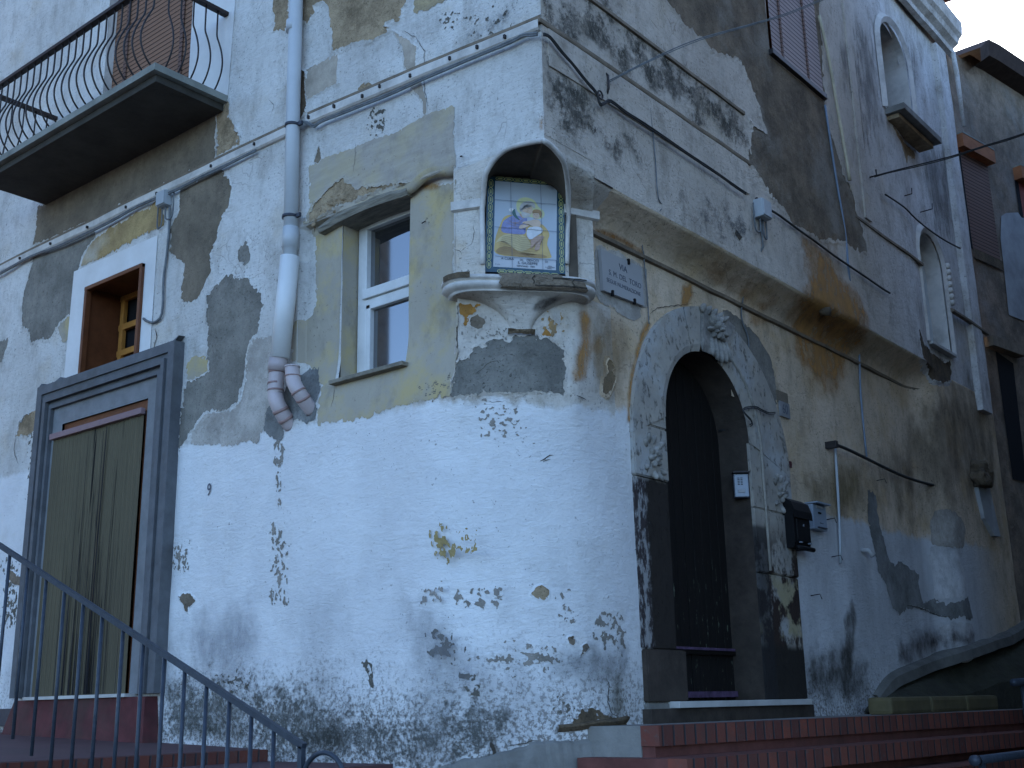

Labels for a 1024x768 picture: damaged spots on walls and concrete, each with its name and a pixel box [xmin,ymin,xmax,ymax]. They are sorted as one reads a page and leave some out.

peeling [303,81,456,237]
damp [543,0,748,144]
flaking render [657,0,870,259]
flaking render [0,96,272,460]
spalling [418,306,570,447]
peeling [273,440,285,507]
peeling [269,522,289,607]
peeling [429,522,477,565]
peeling [929,546,967,600]
peeling [420,581,626,702]
damp [158,676,508,768]